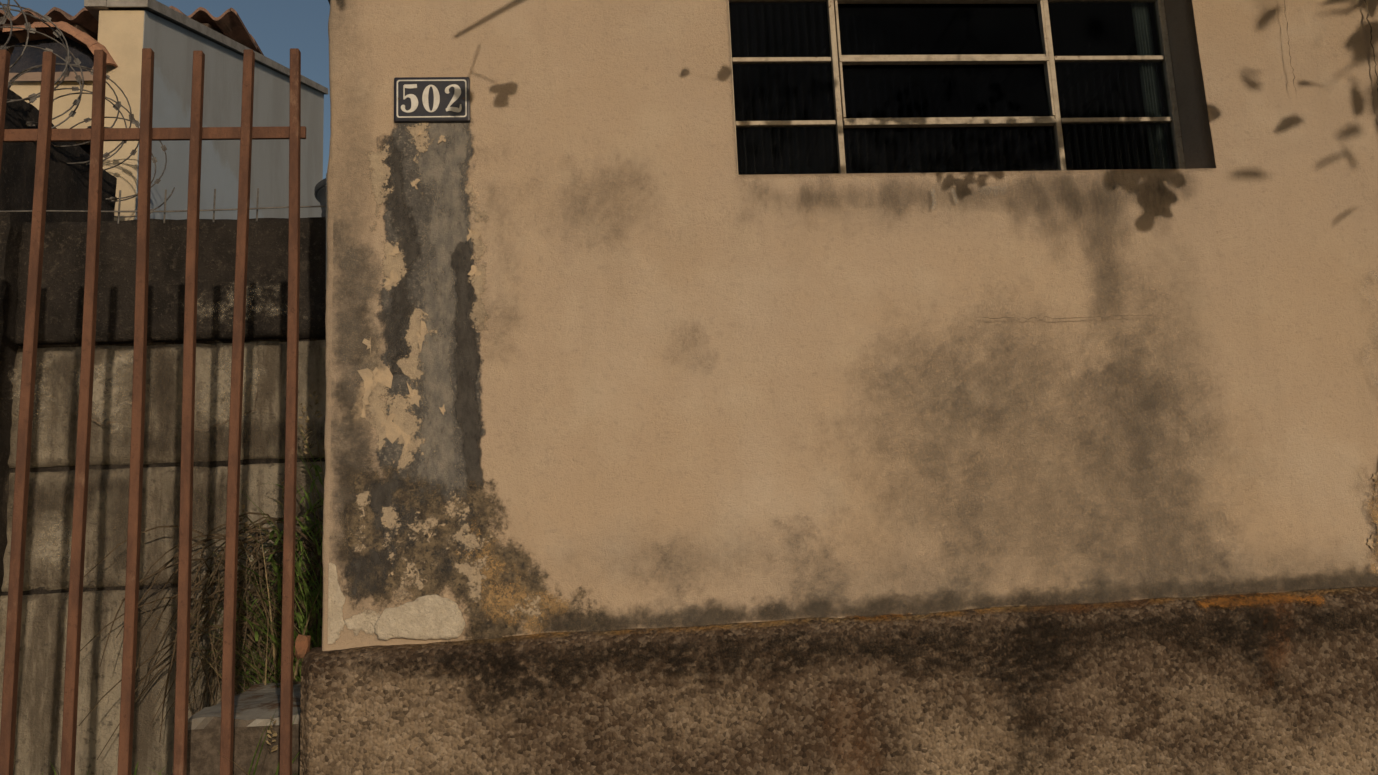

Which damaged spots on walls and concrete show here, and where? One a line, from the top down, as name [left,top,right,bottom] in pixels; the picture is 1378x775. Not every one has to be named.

crack [1364,0,1378,91]
peeling [328,122,606,644]